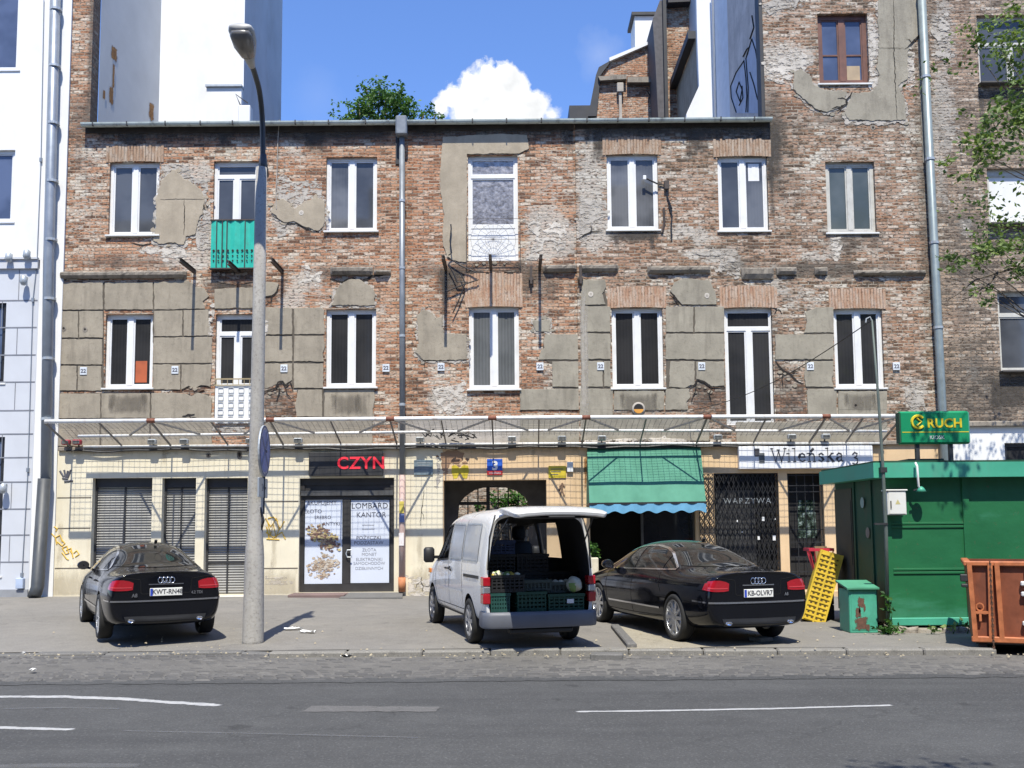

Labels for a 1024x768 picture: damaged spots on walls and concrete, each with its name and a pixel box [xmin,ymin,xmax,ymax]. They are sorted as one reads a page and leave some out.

corrosion [103,45,117,105]
crack [832,92,852,112]
flaking render [759,0,955,130]
flaking render [139,160,214,262]
flaking render [268,173,330,241]
flaking render [467,196,610,273]
flaking render [329,276,380,309]
flaking render [413,306,471,364]
crack [264,381,293,402]
crack [688,379,725,402]
crack [775,361,804,389]